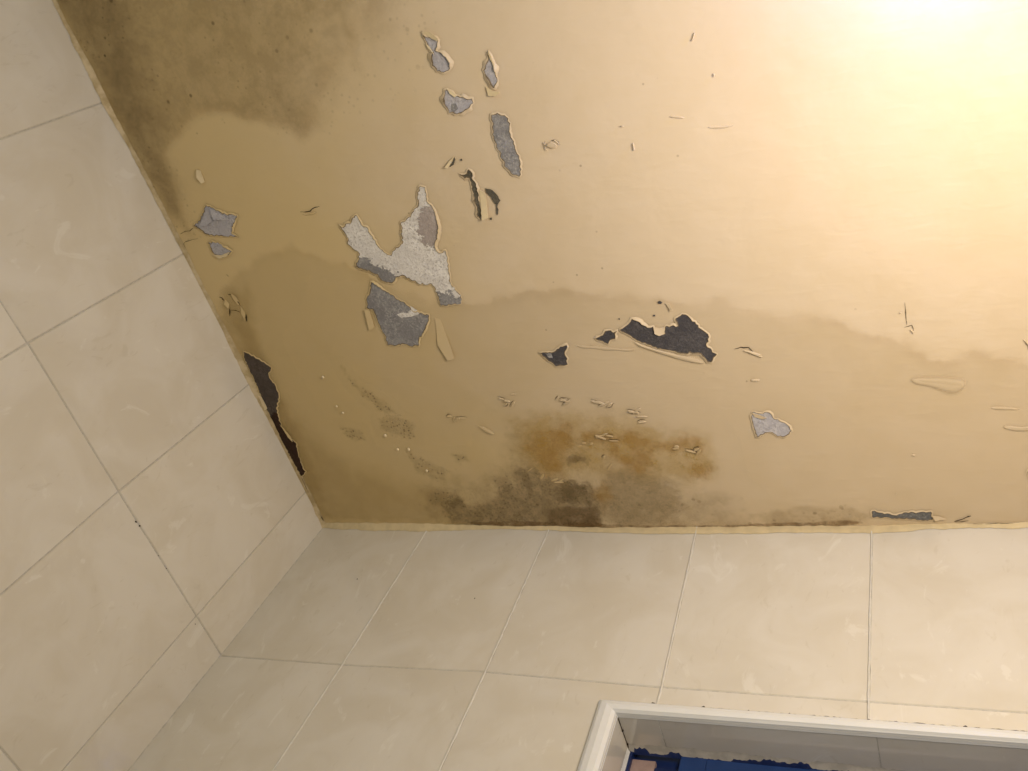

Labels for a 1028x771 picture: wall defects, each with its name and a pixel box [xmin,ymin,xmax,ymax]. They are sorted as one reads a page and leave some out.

peeling [422,31,454,74]
peeling [482,50,500,96]
peeling [440,88,474,116]
peeling [489,111,523,178]
peeling [445,157,500,221]
peeling [193,204,238,259]
peeling [339,184,463,361]
peeling [538,343,569,367]
peeling [594,301,718,364]
peeling [243,351,307,478]
peeling [749,410,794,438]
peeling [870,510,946,522]